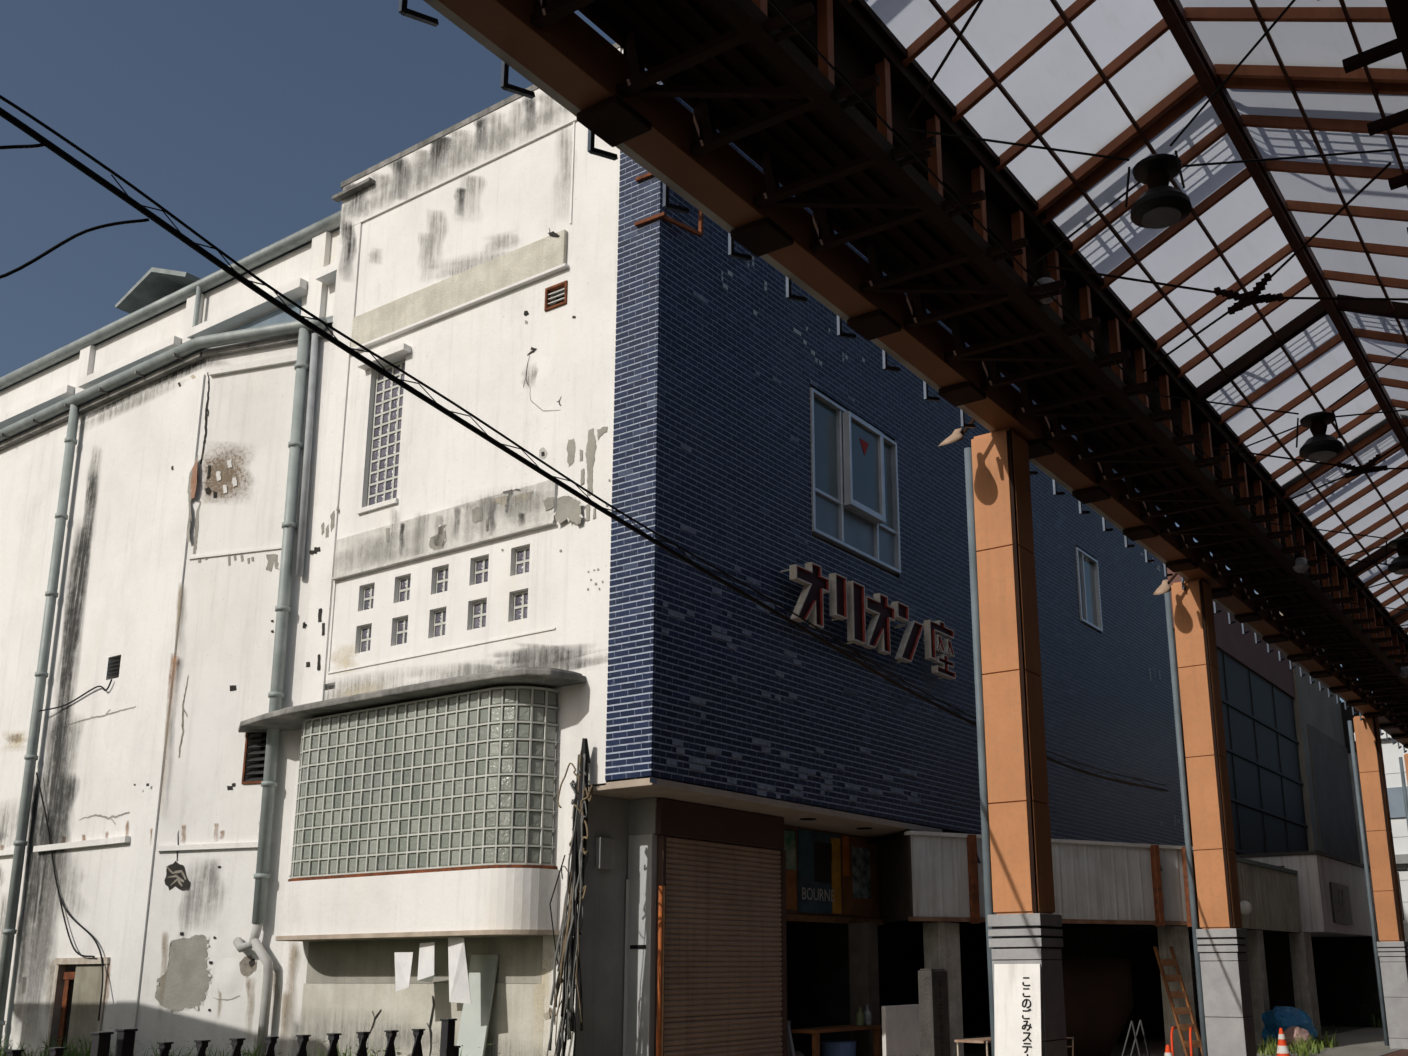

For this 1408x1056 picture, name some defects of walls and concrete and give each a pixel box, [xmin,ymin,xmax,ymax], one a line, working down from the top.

damp [343,96,565,267]
flaking render [171,450,248,503]
damp [512,645,581,670]
damp [0,460,97,984]
spalling [164,830,191,891]
flaking render [154,932,216,1012]